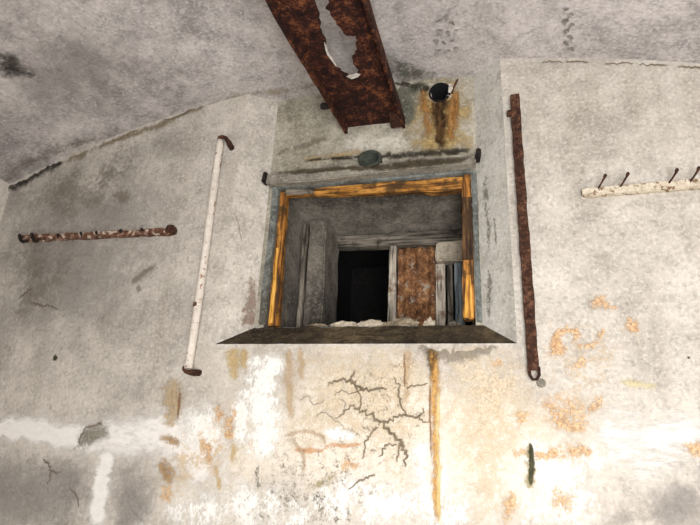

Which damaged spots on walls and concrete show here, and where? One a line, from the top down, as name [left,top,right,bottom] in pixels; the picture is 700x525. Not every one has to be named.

rust [411,82,473,150]
leakage [8,147,62,190]
leakage [278,148,470,174]
peeling [78,422,108,447]
rust [164,380,181,426]
rust [295,443,360,453]
crack [302,370,429,467]
rust [427,349,441,517]